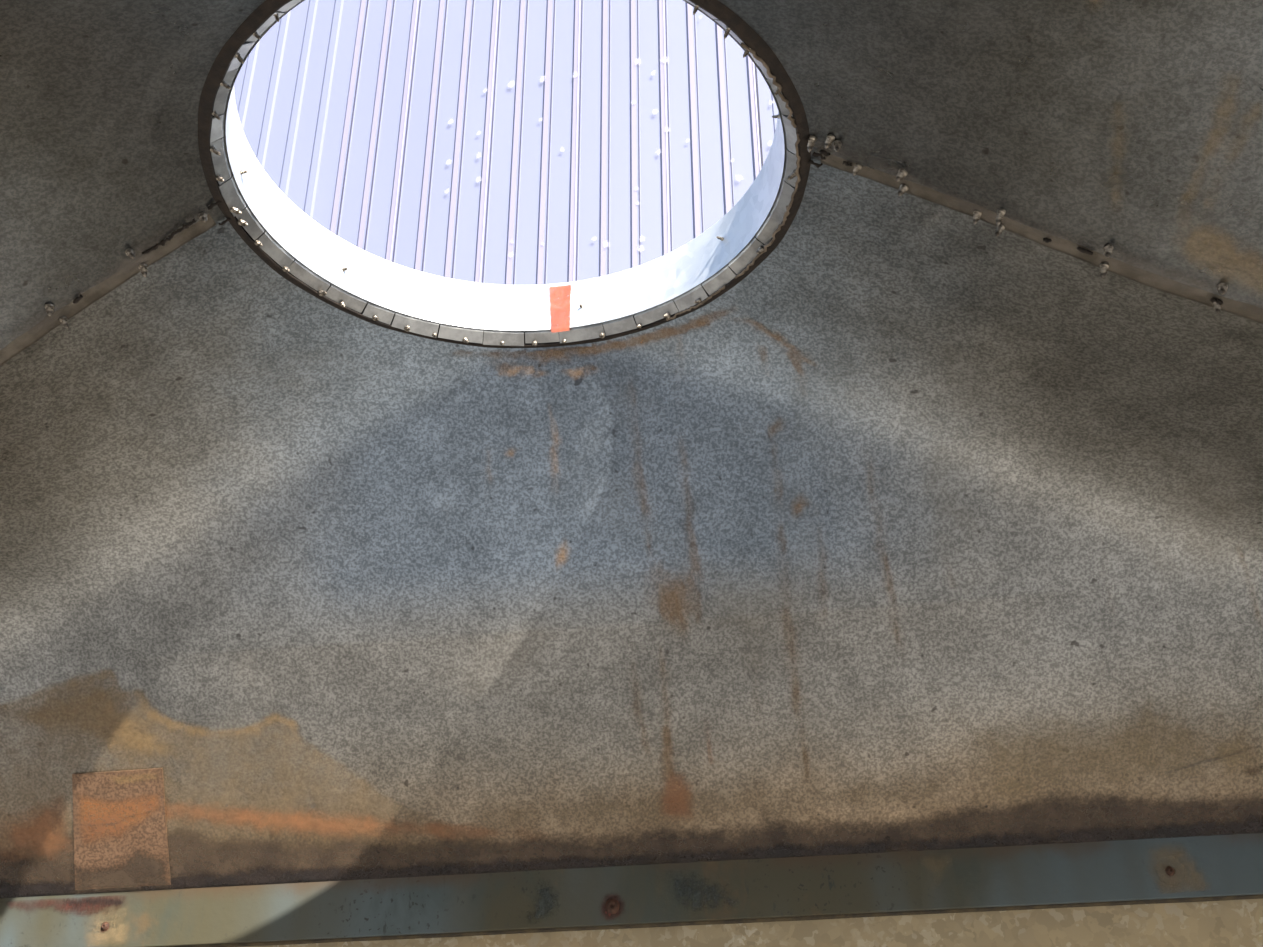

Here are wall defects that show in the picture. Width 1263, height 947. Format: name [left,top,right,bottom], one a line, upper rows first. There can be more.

rust [0,796,1263,914]